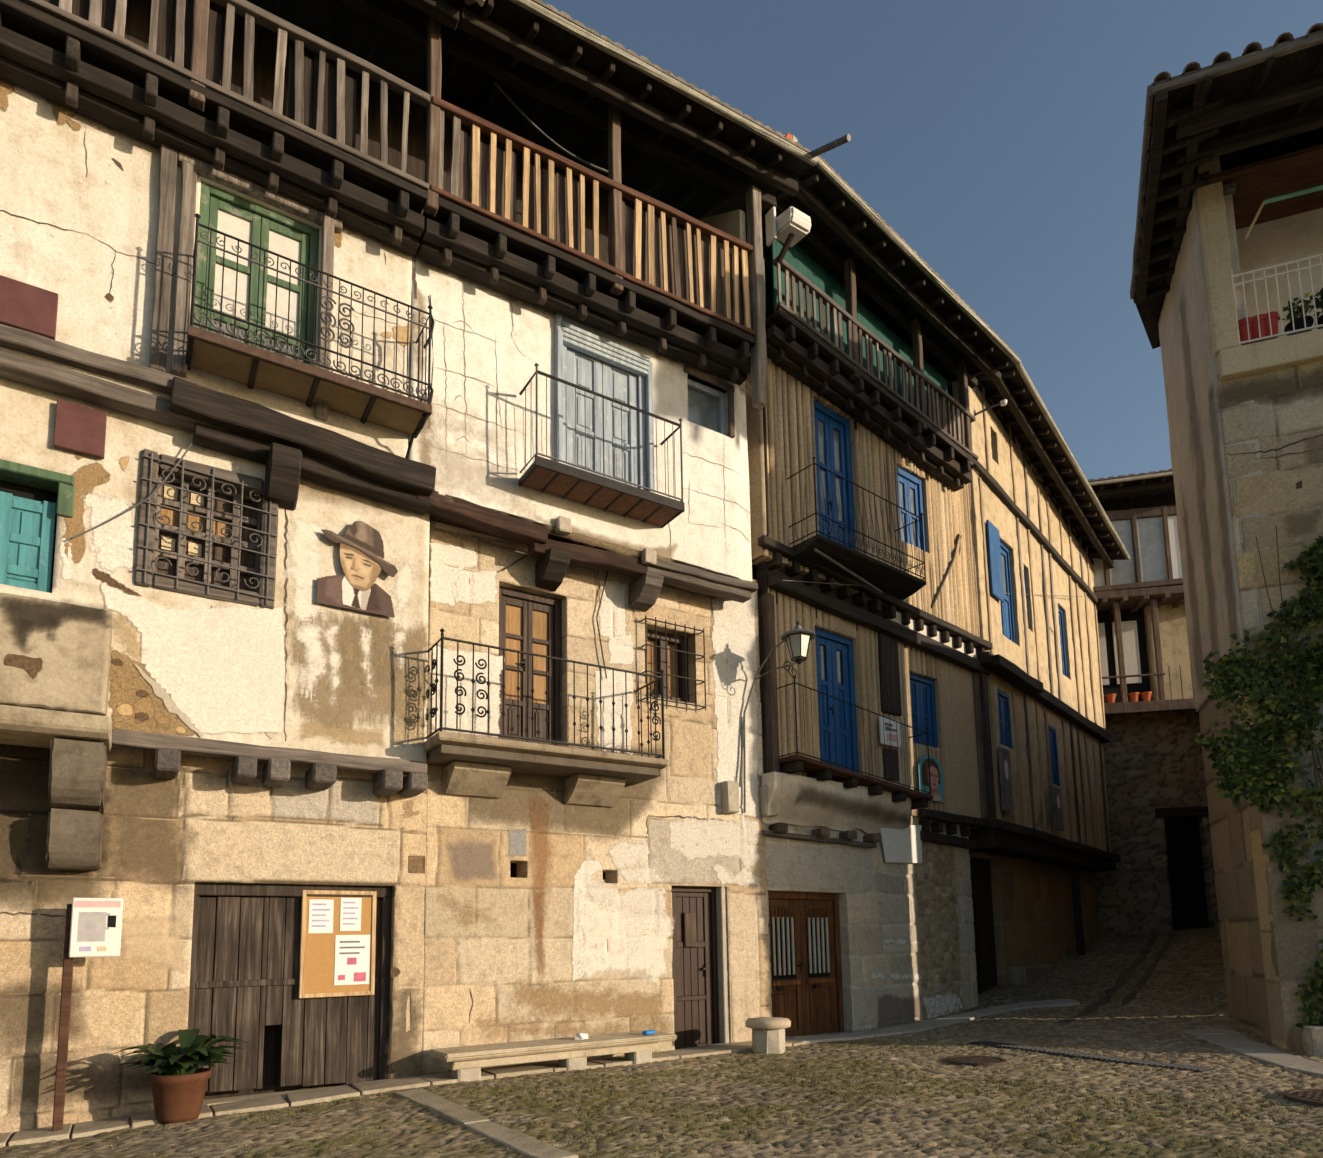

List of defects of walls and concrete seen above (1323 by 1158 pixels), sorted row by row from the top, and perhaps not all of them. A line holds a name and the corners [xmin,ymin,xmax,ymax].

peeling [0,79,15,112]
crack [0,210,176,293]
peeling [381,323,412,346]
peeling [63,453,141,597]
water stain [0,598,106,647]
spalling [4,654,43,679]
spalling [109,616,204,737]
water stain [290,614,431,744]
peeling [741,815,760,846]
peeling [713,864,762,888]